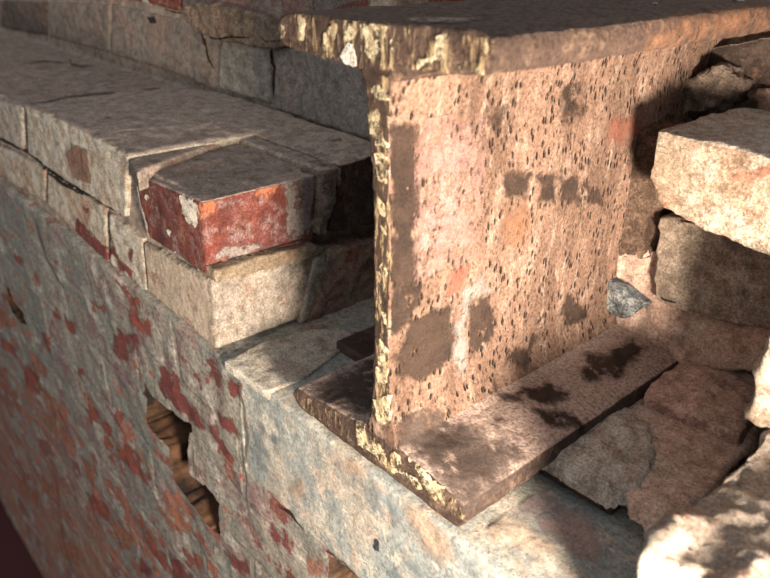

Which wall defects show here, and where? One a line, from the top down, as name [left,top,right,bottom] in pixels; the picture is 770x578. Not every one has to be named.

crack [201,33,280,97]
peeling [461,35,495,75]
crack [0,138,121,215]
peeling [215,244,260,260]
peeling [281,14,476,425]
rust [310,70,496,419]
rust [504,171,603,206]
rust [581,338,643,381]
peeling [158,366,240,464]
rust [494,383,584,434]
peeling [297,393,465,519]
rust [396,411,522,518]